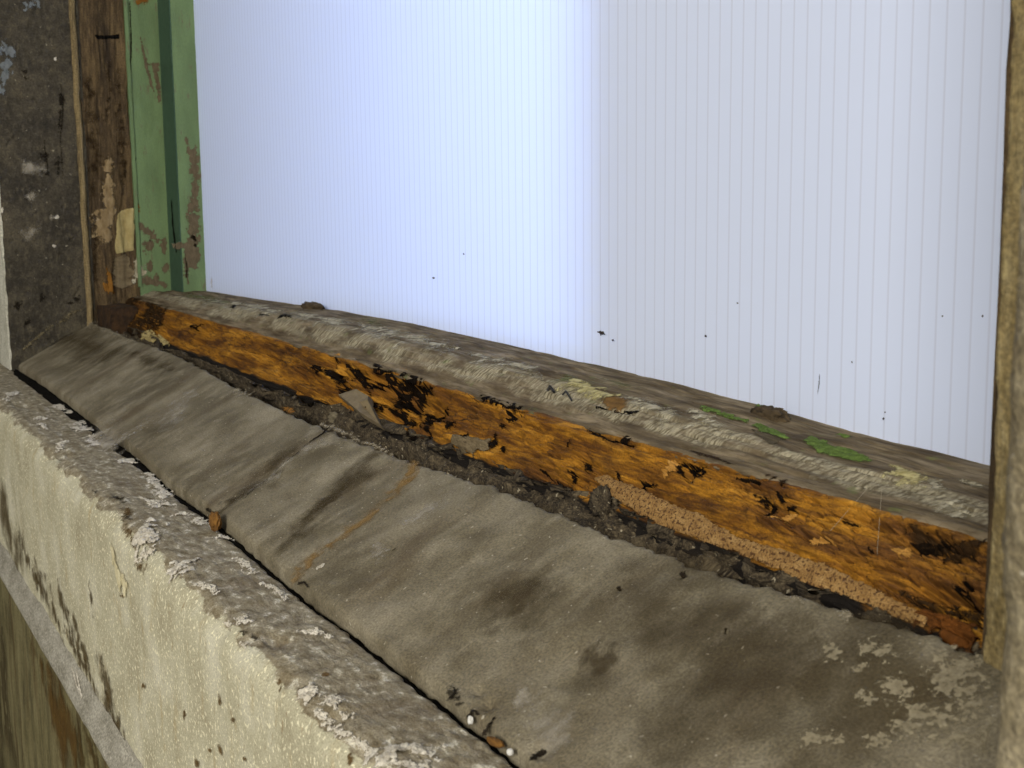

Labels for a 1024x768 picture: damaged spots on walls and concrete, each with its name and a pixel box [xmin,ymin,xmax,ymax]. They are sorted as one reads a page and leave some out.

peeling [115,137,201,288]
spalling [310,357,523,456]
spalling [587,428,634,448]
spalling [676,462,707,483]
spalling [736,477,799,516]
spalling [910,539,954,557]
spalling [166,557,220,595]
spalling [231,556,289,601]
water stain [0,488,125,746]
spalling [296,627,334,639]
peeling [898,578,984,628]
water stain [77,721,99,768]